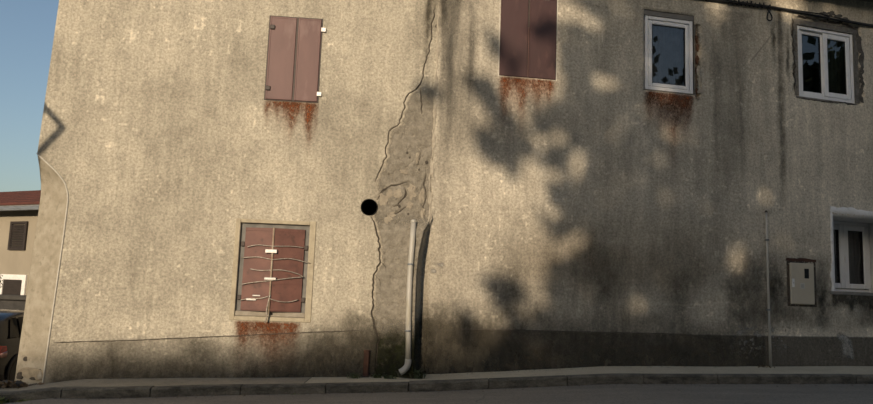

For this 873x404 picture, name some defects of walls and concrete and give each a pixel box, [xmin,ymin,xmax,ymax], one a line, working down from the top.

rust [265,101,315,130]
crack [375,9,435,181]
flaking render [375,3,440,225]
rust [500,77,553,106]
rust [646,92,692,131]
leakage [815,289,873,322]
rust [237,322,297,353]
leakage [411,317,765,381]